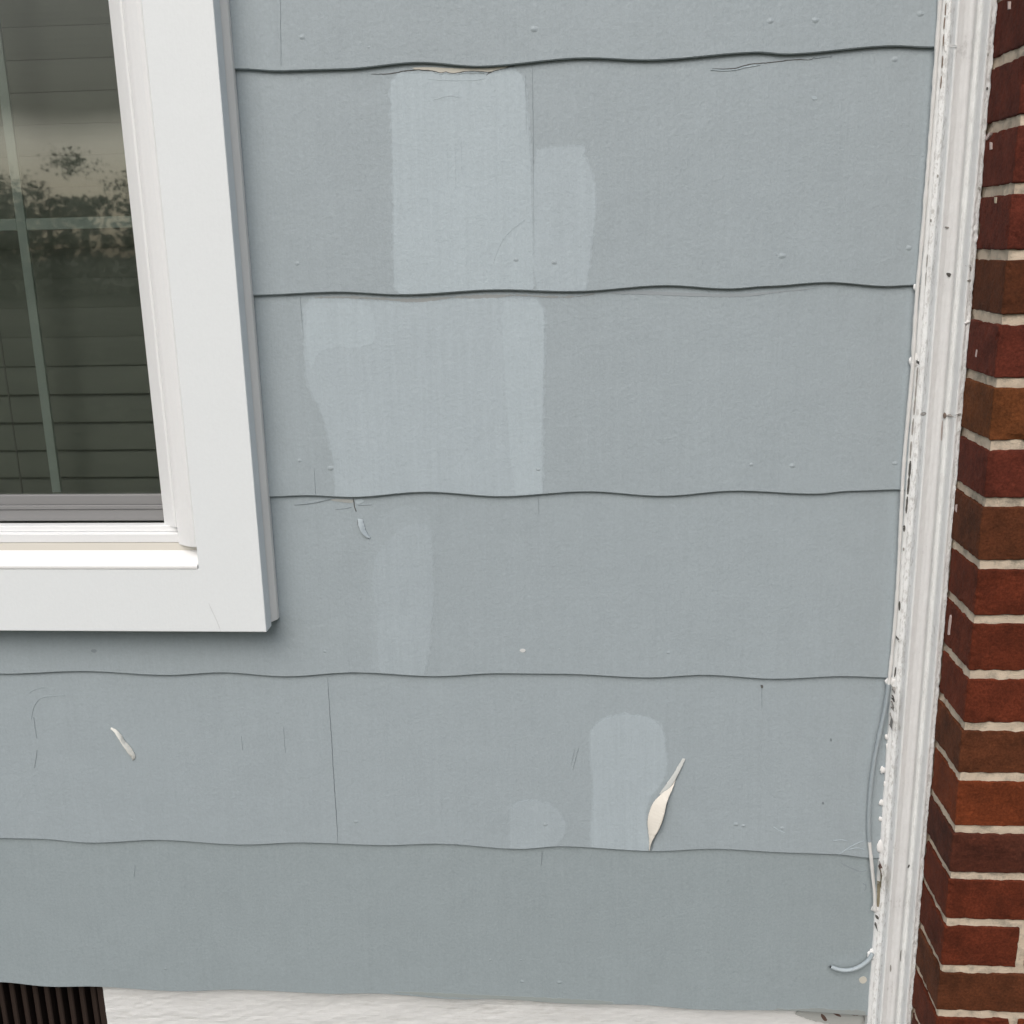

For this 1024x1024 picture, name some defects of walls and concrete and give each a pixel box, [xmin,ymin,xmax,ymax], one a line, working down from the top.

peeling [647,780,676,851]